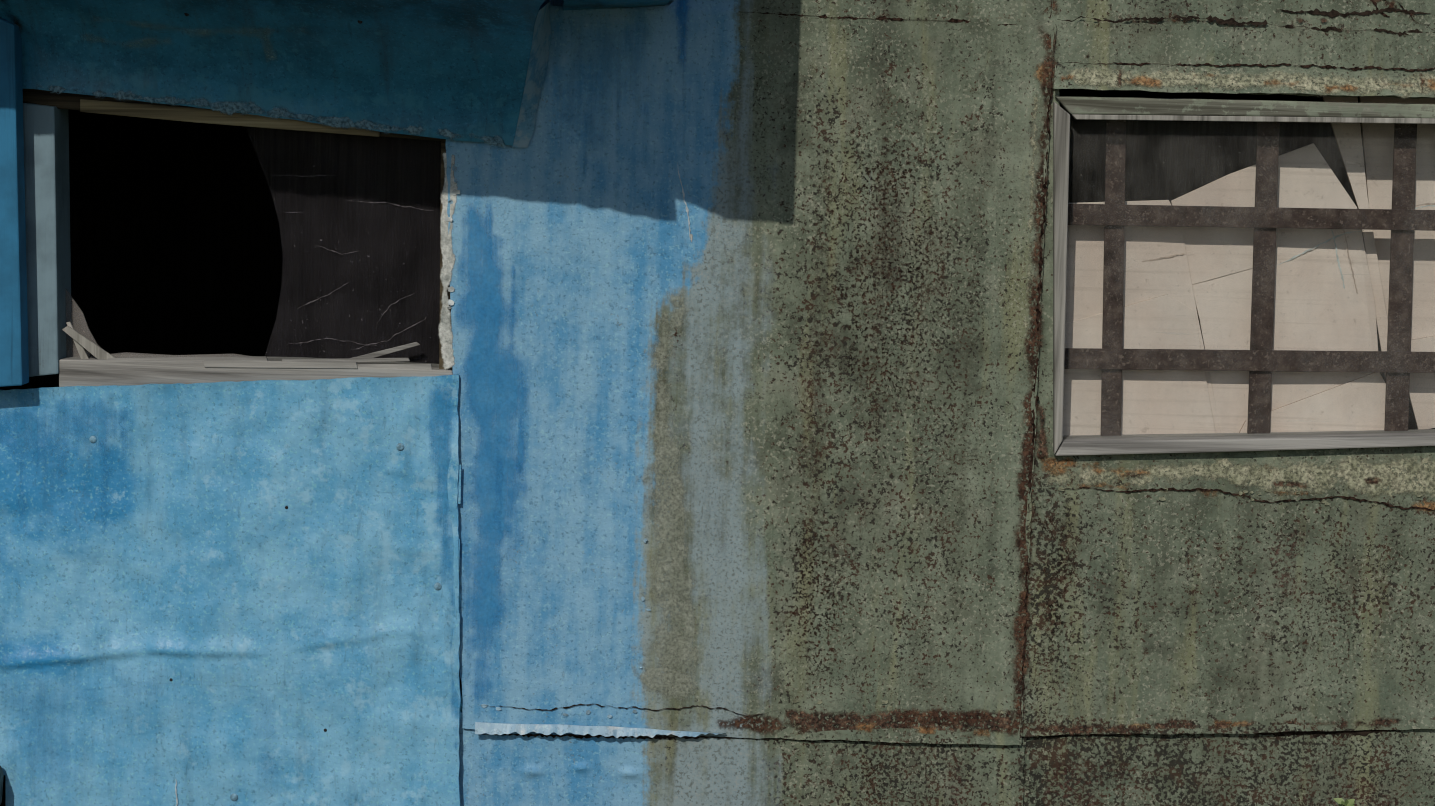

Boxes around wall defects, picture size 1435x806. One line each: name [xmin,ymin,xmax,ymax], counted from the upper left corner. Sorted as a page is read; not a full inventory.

crack [1371,0,1429,27]
rust [706,31,1435,753]